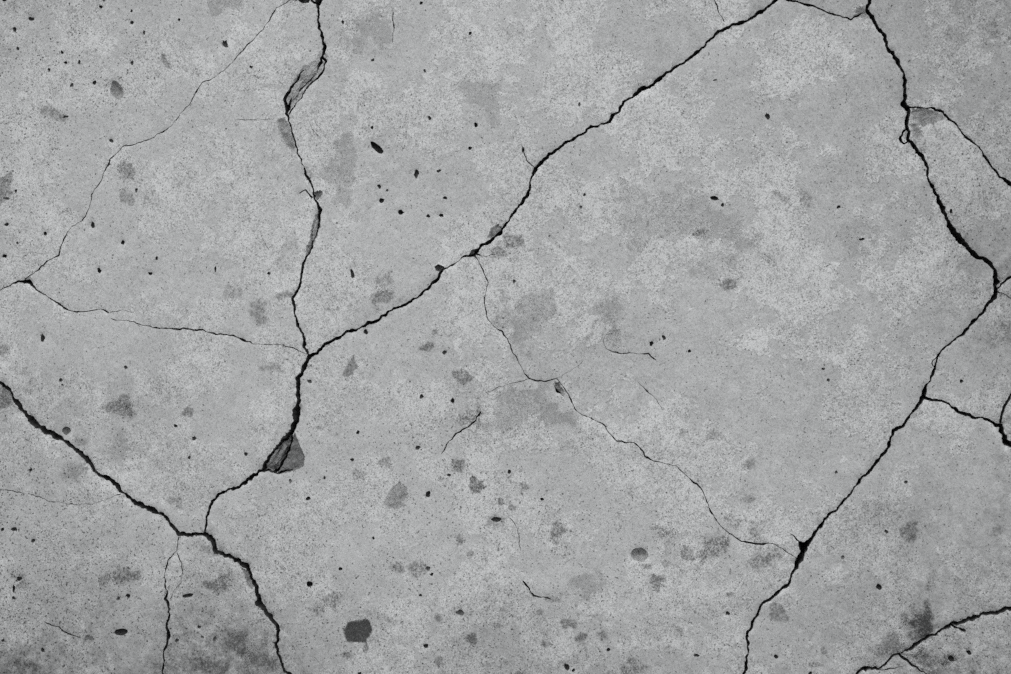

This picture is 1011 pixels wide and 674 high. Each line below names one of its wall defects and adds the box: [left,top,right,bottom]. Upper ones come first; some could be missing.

spalling [265,429,305,483]
crack [0,0,778,674]
crack [669,0,1011,674]